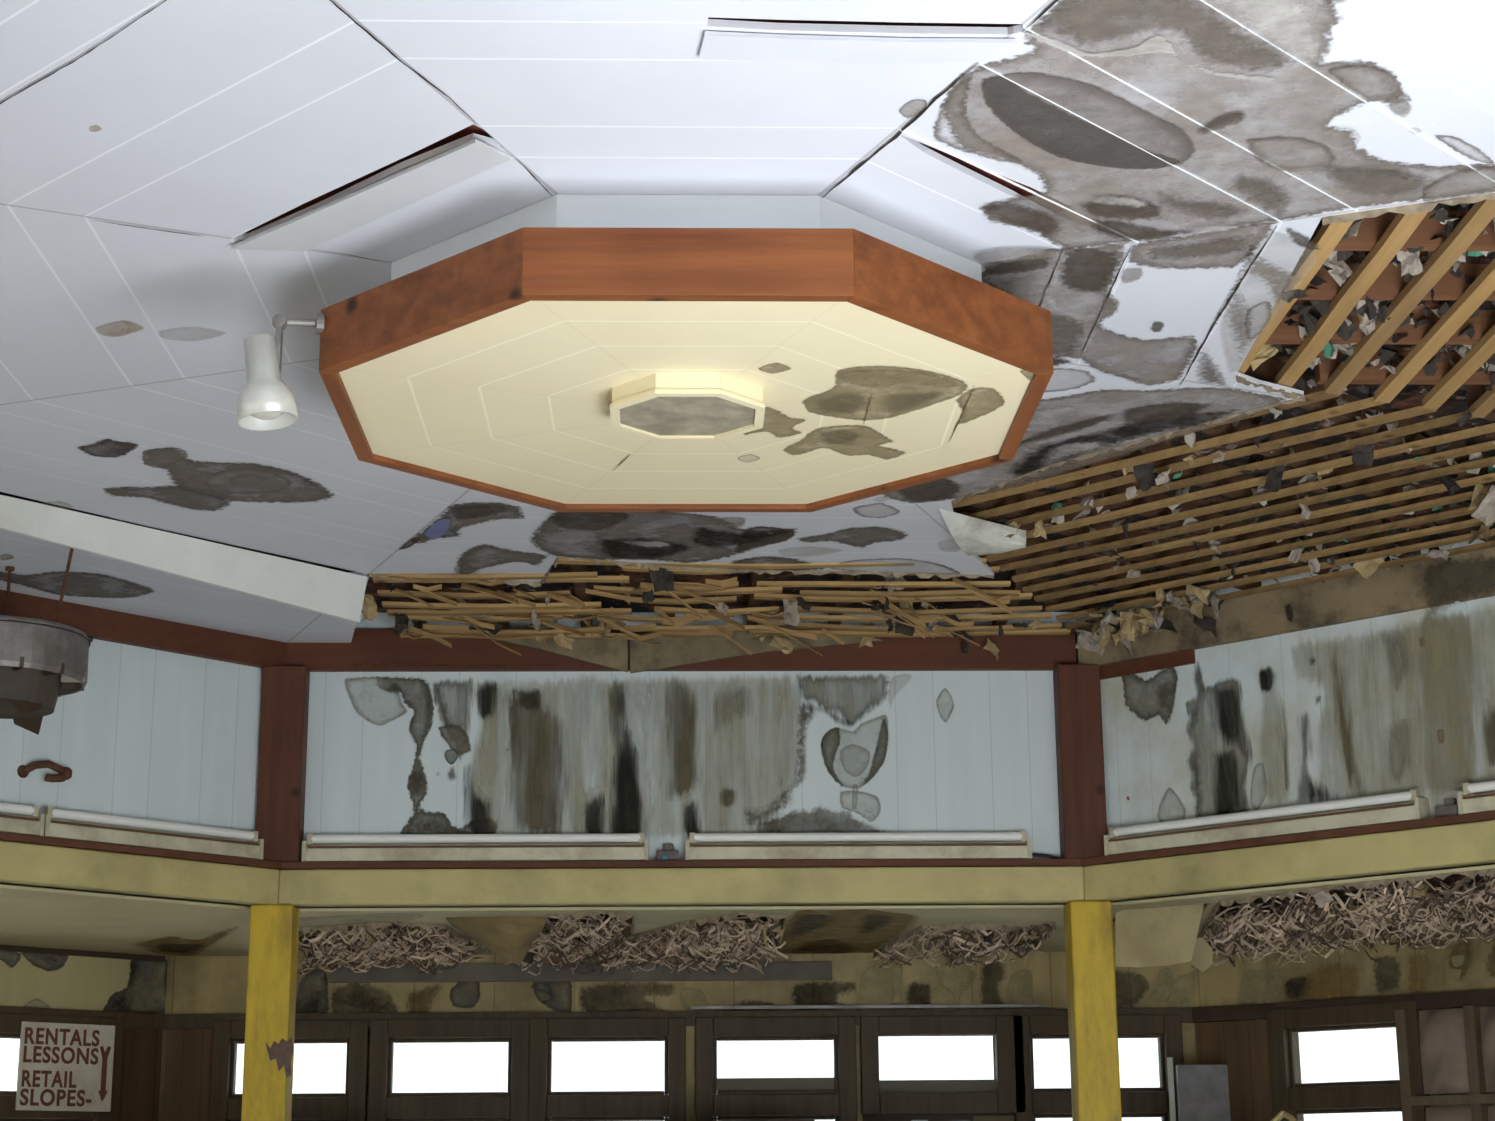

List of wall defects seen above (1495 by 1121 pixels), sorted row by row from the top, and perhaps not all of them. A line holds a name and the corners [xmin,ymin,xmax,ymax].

leakage [399,0,1495,574]
peeling [1324,251,1352,286]
peeling [1249,344,1279,371]
peeling [1308,296,1394,370]
leakage [78,439,334,511]
peeling [1435,475,1495,536]
peeling [856,574,1028,661]
peeling [1075,550,1225,657]
leakage [1259,668,1273,691]
leakage [345,665,888,836]
leakage [1121,667,1266,822]
leakage [103,932,225,1014]